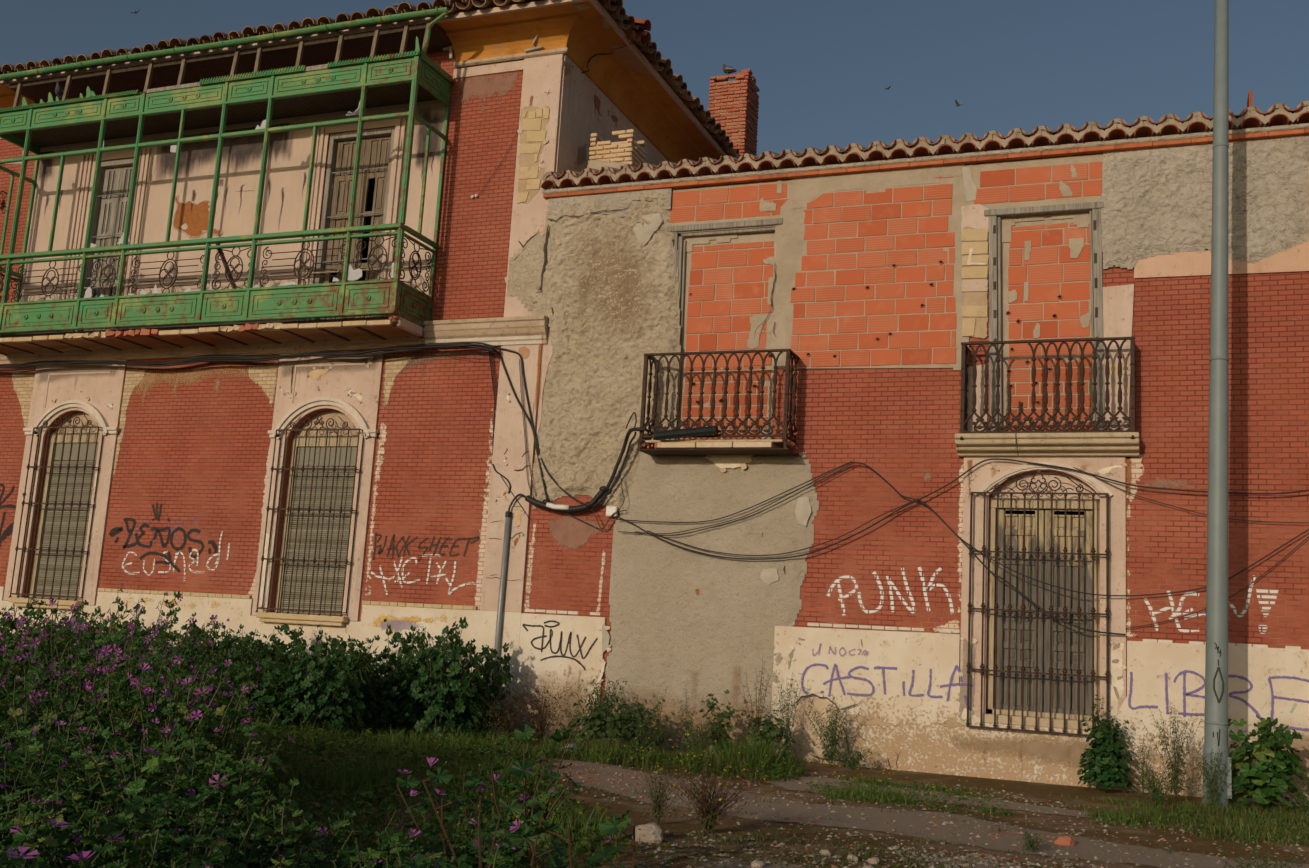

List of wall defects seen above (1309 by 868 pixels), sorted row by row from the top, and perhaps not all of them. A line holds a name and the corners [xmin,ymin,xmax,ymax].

damp [159,123,289,174]
peeling [475,392,601,612]
spalling [596,549,611,684]